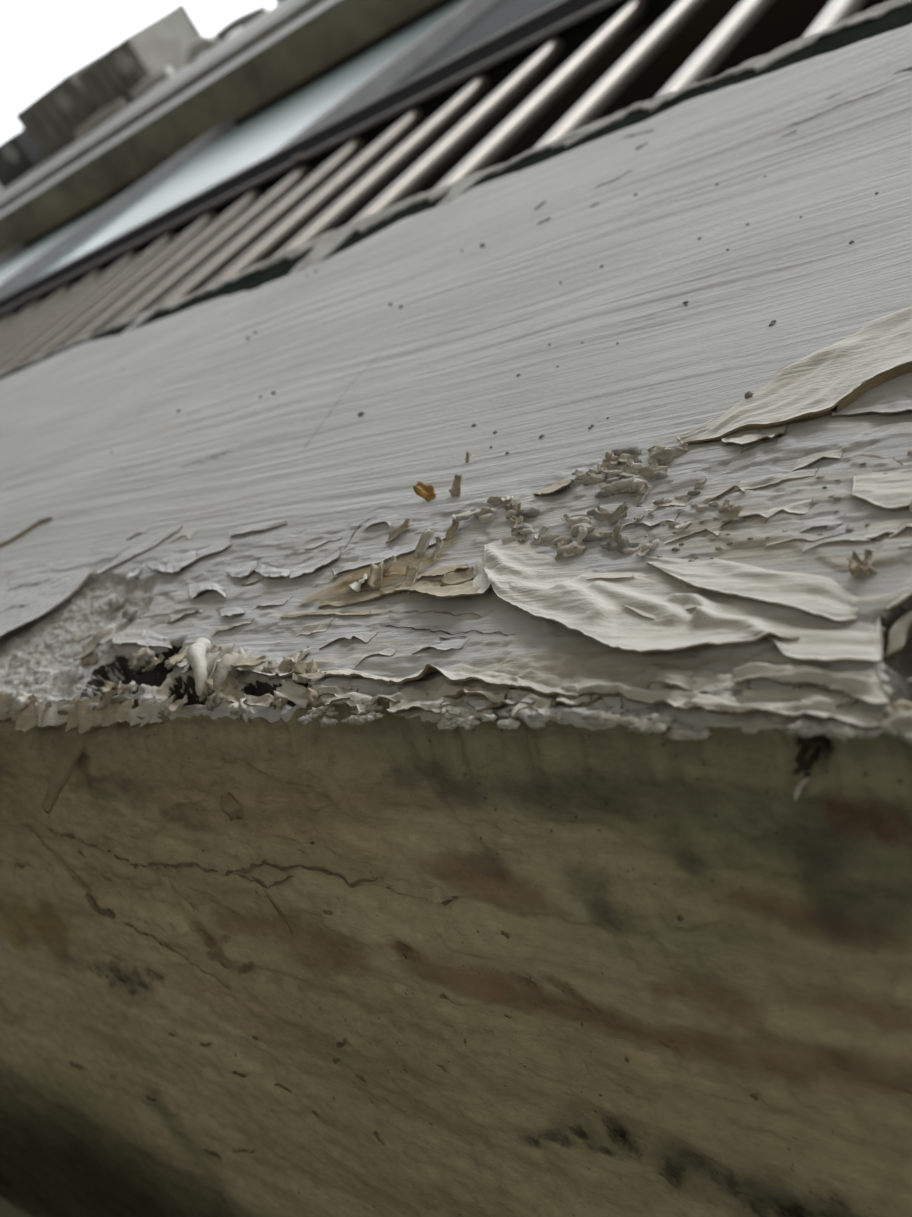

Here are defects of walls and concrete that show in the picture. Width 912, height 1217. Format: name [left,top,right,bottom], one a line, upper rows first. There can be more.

peeling [0,306,912,735]
crack [25,812,397,993]
crack [426,896,458,906]